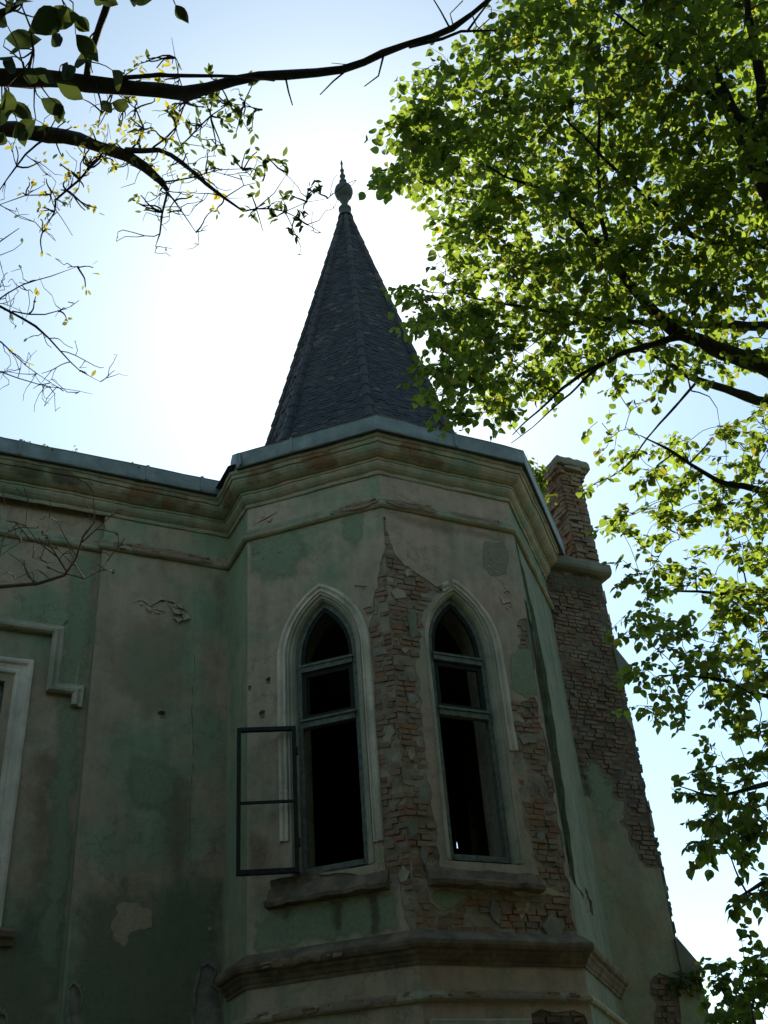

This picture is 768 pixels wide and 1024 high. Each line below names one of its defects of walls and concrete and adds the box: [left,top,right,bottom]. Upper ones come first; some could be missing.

flaking render [355,517,576,935]
flaking render [546,569,676,939]
flaking render [649,973,681,1024]